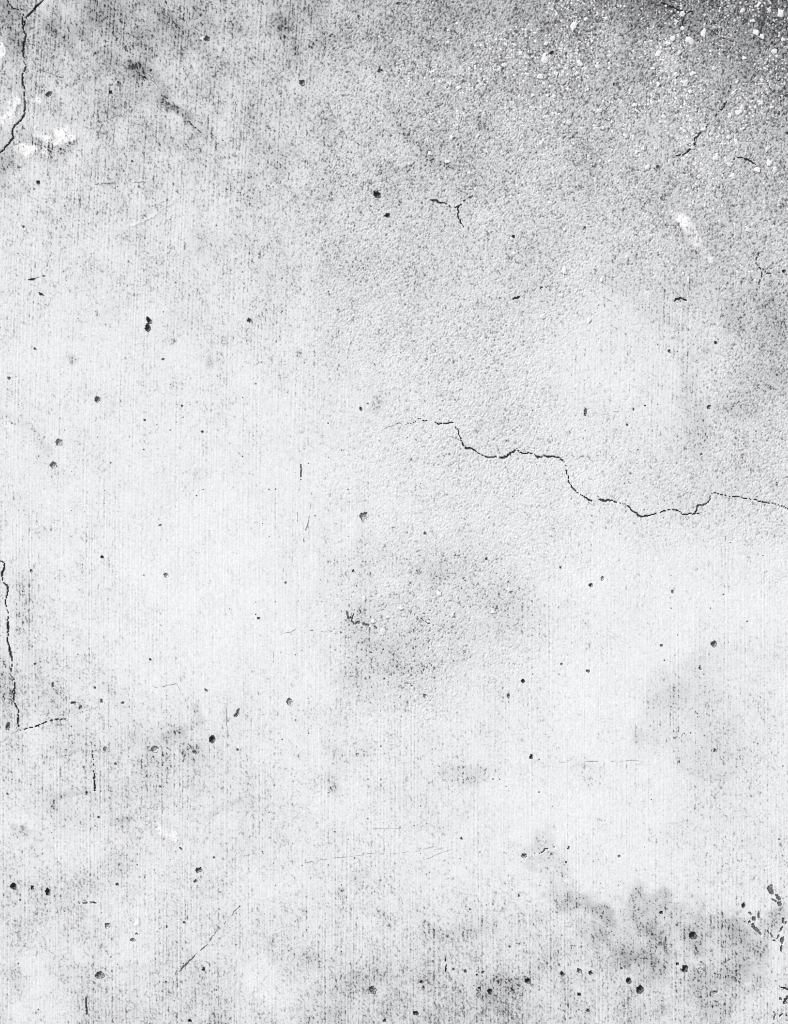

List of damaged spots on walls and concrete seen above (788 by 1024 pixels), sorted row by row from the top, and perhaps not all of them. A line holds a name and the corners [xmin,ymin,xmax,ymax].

crack [1,0,41,152]
crack [386,418,788,520]
crack [1,561,62,741]